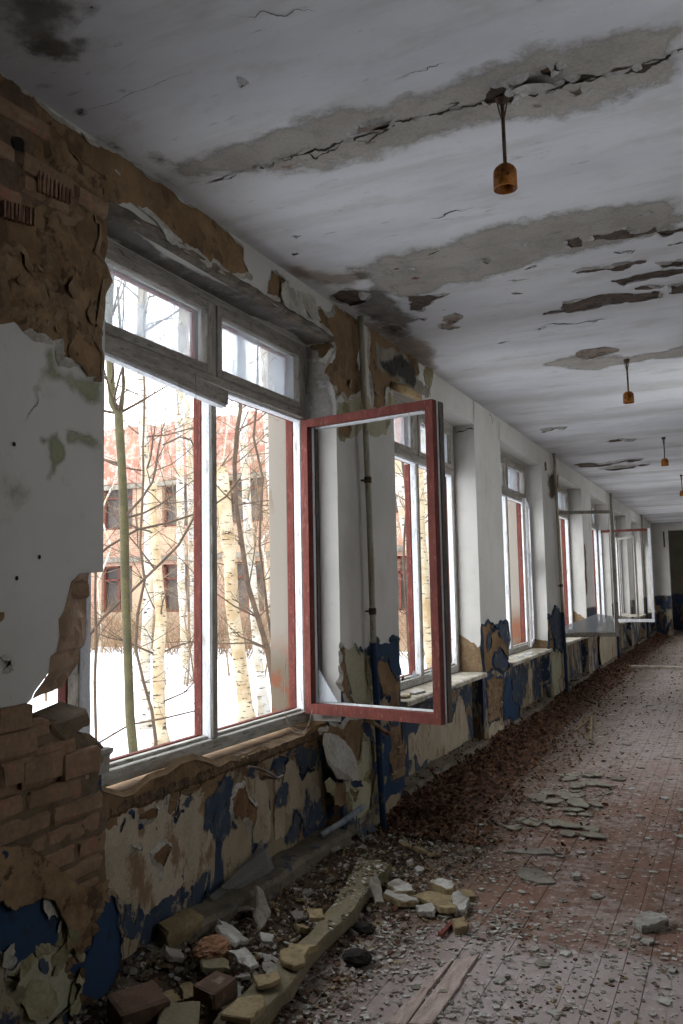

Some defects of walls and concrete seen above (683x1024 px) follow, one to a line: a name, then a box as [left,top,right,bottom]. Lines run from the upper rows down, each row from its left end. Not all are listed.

leakage [15,0,84,57]
crack [514,49,683,97]
crack [205,100,485,184]
flaking render [0,73,433,408]
spalling [563,226,683,249]
spalling [543,259,683,315]
spalling [576,347,619,360]
spalling [573,458,650,471]
spalling [32,572,89,699]
peeling [528,618,564,704]
peeling [599,619,620,665]
flaking render [0,695,468,916]